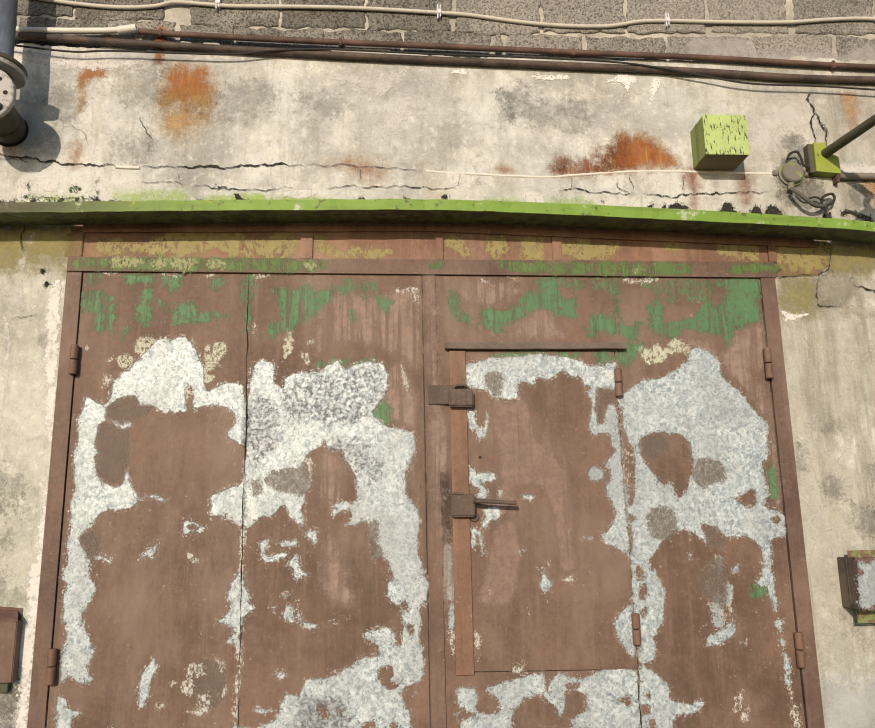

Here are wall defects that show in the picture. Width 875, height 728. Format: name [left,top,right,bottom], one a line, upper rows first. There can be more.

crack [0,153,115,166]
rust [79,63,106,111]
rust [155,26,212,137]
crack [139,117,460,191]
rust [552,134,677,176]
crack [806,94,829,145]
crack [780,249,841,307]
peeling [53,334,430,728]
peeling [453,346,803,728]
leakage [0,476,49,728]
peeling [442,529,455,655]